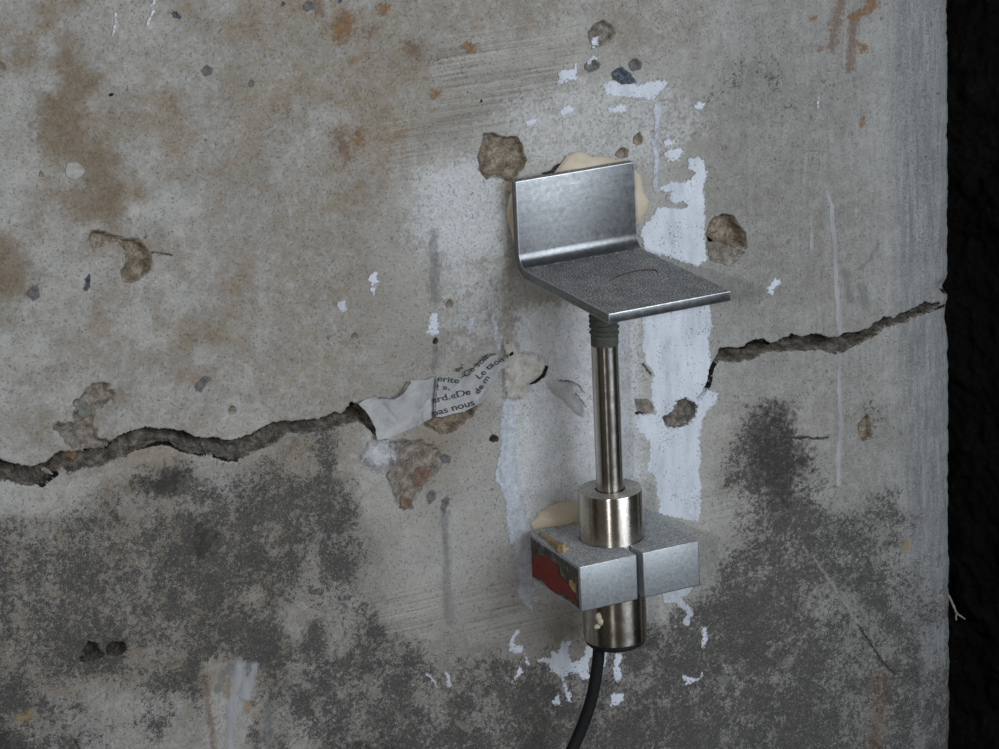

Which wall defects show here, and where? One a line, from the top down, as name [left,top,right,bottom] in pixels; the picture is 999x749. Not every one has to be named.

corrosion [847,0,877,23]
spalling [477,132,527,182]
peeling [603,58,748,267]
spalling [89,229,153,283]
efflorescence [825,190,842,335]
crack [677,288,946,402]
crack [0,402,376,488]
peeling [634,305,719,521]
crack [794,434,829,442]
efflorescence [227,663,257,749]
peeling [509,630,593,706]
peeling [604,652,624,707]